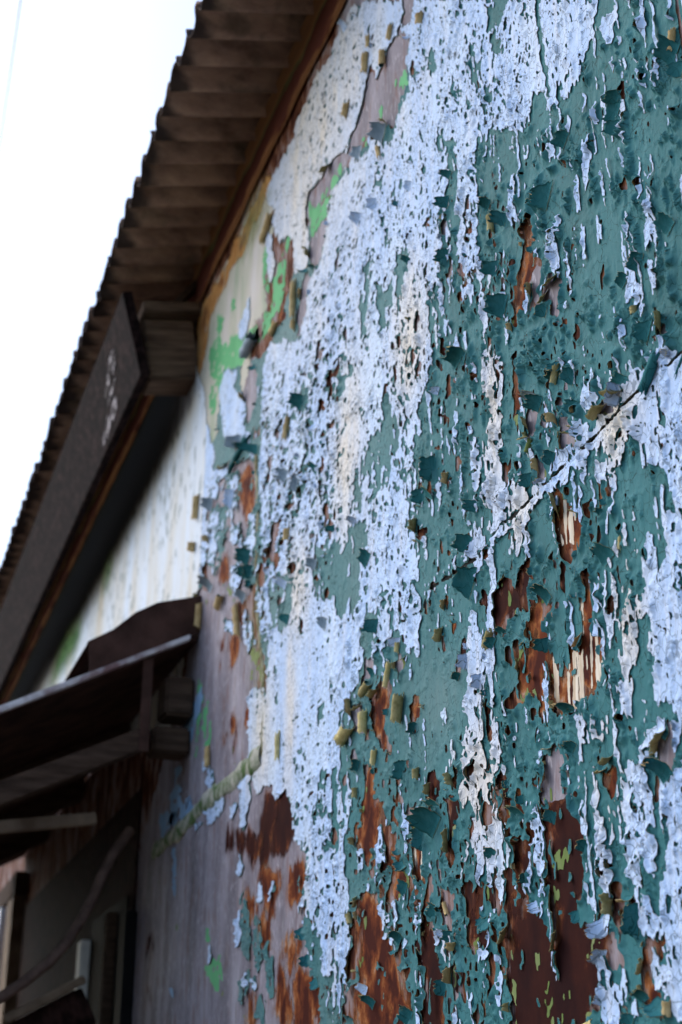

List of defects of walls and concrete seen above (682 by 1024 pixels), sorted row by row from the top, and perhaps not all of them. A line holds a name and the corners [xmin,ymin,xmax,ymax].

peeling [289,0,423,338]
peeling [432,195,450,265]
corrosion [479,180,553,331]
crack [401,351,682,622]
corrosion [548,486,621,567]
peeling [516,304,682,489]
peeling [131,331,323,1024]
corrosion [225,791,322,1024]
peeling [333,657,375,774]
corrosion [345,660,672,1024]
corrosion [431,566,607,733]
peeling [638,721,679,785]